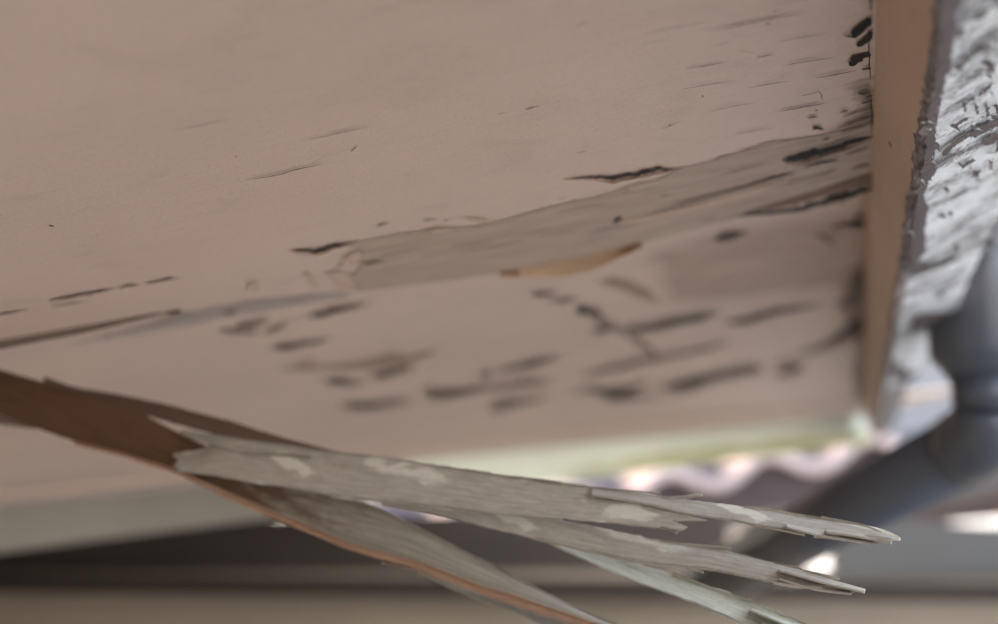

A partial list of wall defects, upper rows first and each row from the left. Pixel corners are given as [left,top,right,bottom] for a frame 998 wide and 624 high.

peeling [907,0,998,277]
peeling [346,123,874,292]
crack [325,356,565,411]
crack [527,292,864,401]
peeling [909,309,958,334]